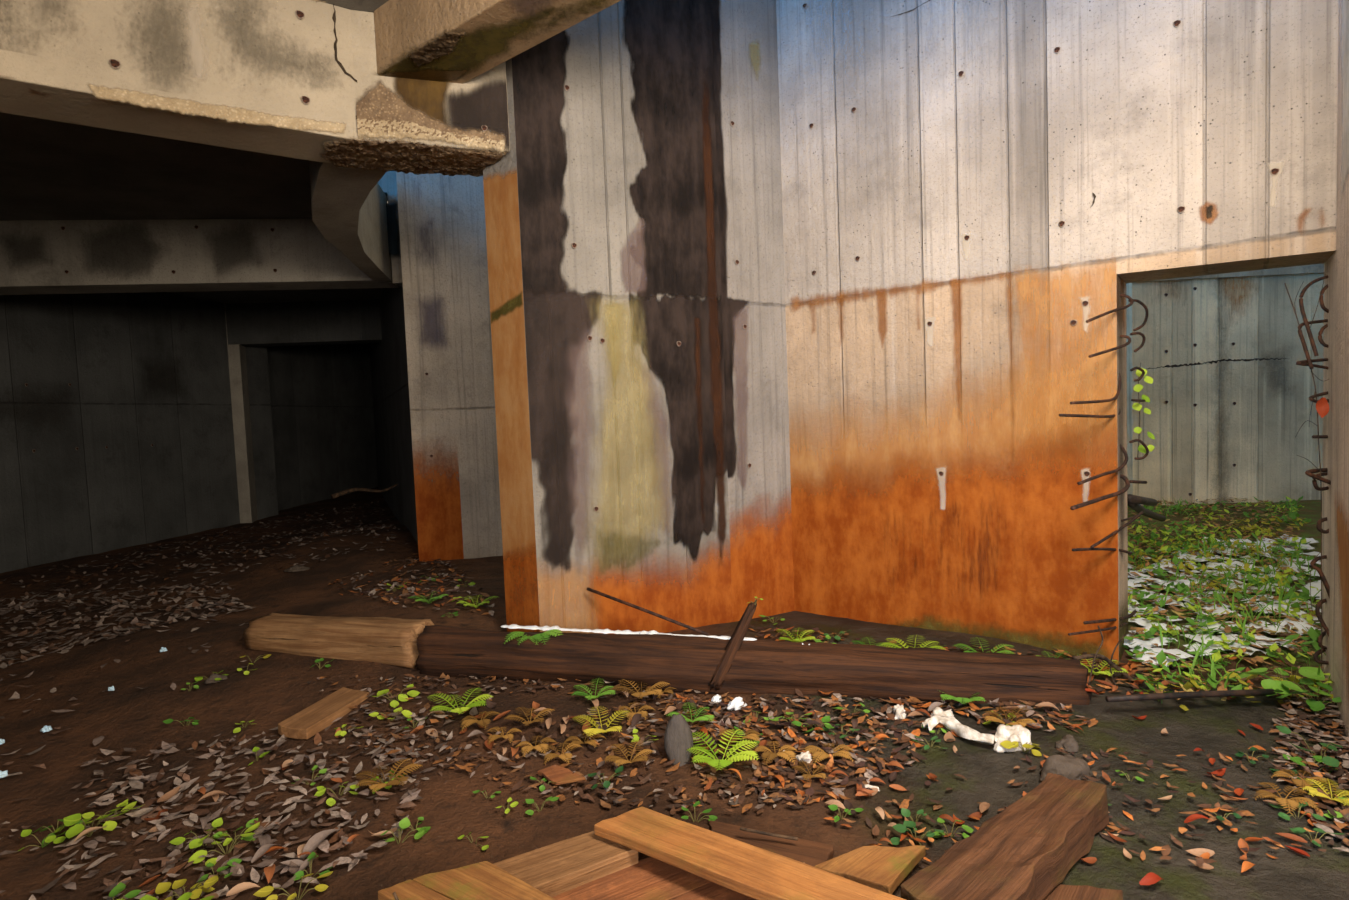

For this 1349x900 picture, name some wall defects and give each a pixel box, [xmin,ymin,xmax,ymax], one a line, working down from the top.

crack [332,4,357,82]
spalling [88,81,507,177]
water stain [386,202,401,257]
water stain [395,0,747,570]
rust [483,92,1129,664]
spalling [1059,294,1148,418]
spalling [1296,275,1329,369]
rust [413,455,464,561]
spalling [1072,511,1144,554]
spalling [1070,439,1149,510]
spalling [1310,555,1330,685]
rust [1337,506,1349,669]